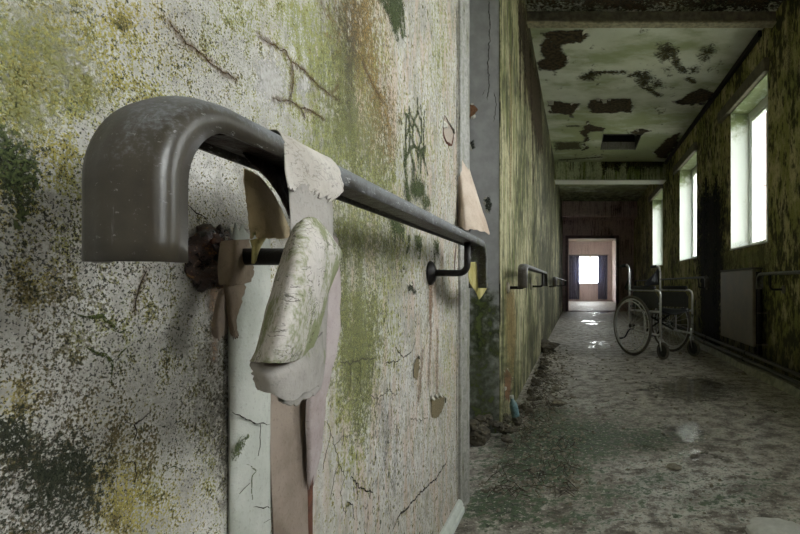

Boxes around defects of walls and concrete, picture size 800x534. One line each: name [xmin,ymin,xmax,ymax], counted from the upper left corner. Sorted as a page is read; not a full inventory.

crack [170,23,235,80]
crack [261,37,342,120]
spalling [537,28,589,73]
spalling [547,98,635,151]
spalling [672,88,713,106]
peeling [249,129,344,534]
damp [339,237,377,439]
peeling [413,353,421,380]
peeling [431,392,447,419]
damp [0,407,118,534]
crack [234,413,270,523]
crack [392,461,447,531]